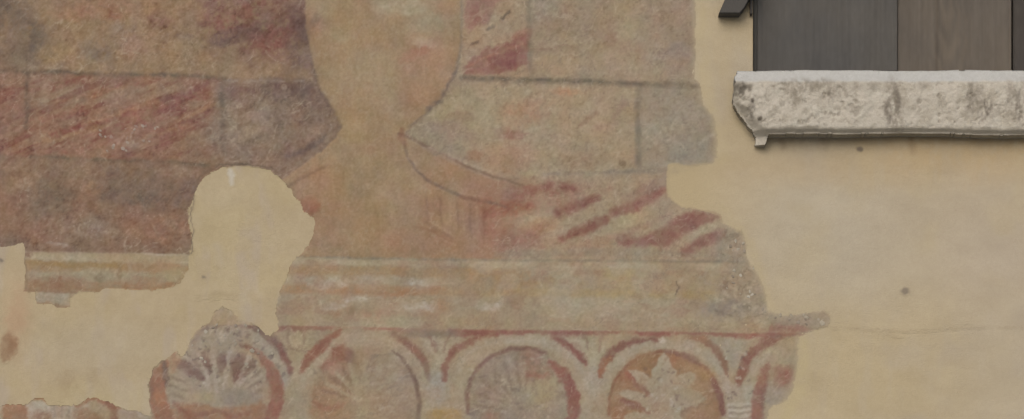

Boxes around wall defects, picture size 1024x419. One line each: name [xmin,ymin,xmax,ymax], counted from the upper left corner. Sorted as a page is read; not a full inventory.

flaking render [0,166,315,416]